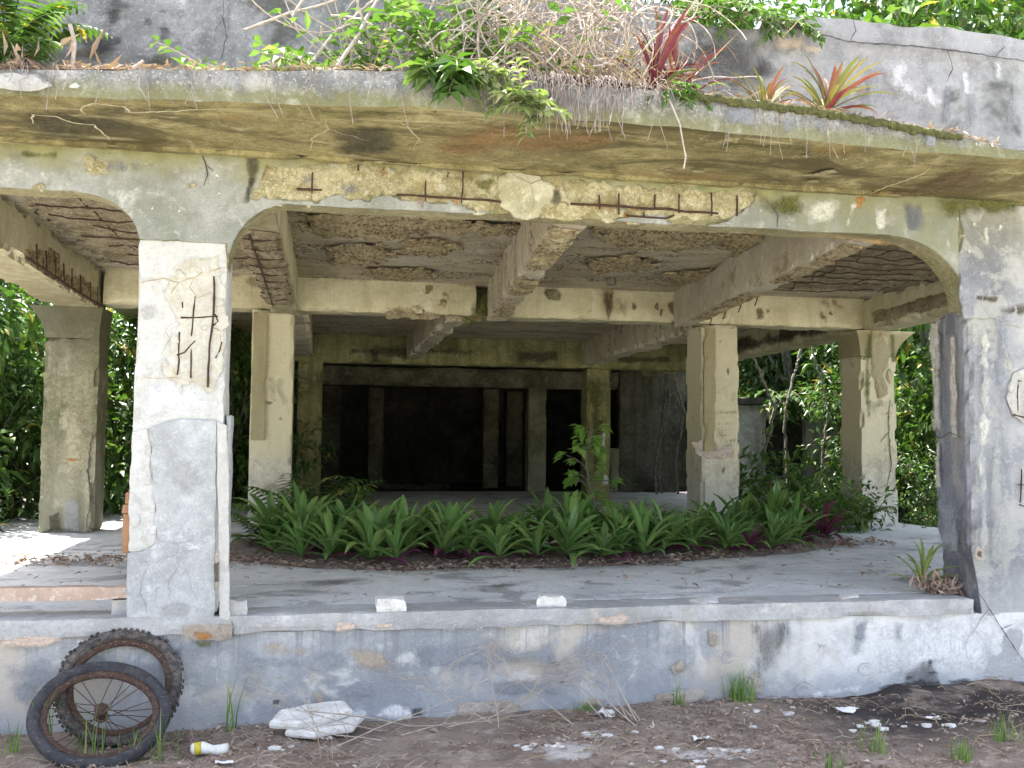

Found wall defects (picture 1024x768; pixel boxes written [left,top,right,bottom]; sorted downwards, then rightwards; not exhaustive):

spalling [22,183,140,265]
leakage [338,128,394,153]
spalling [232,163,521,306]
spalling [385,176,764,327]
leakage [727,109,756,125]
peeling [807,170,838,183]
leakage [893,170,987,229]
spalling [162,255,229,394]
spalling [769,242,948,429]
spalling [692,440,734,473]
leakage [940,508,957,551]
crack [133,531,210,612]